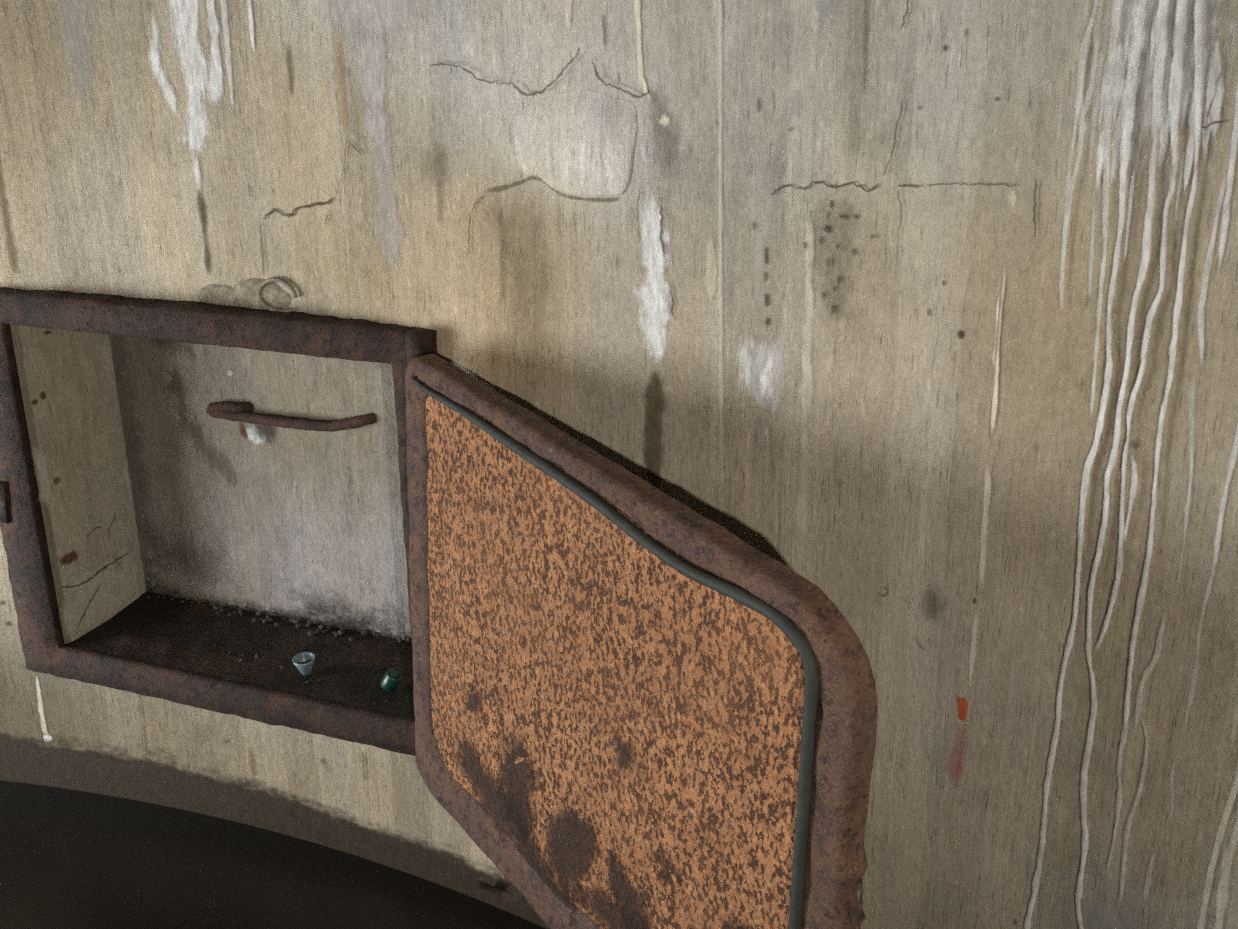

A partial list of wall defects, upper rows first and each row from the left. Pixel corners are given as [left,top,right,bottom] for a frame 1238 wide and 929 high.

leakage [150,0,232,270]
crack [264,141,361,221]
crack [468,196,484,253]
crack [430,48,649,98]
crack [771,102,1038,236]
leakage [1198,92,1238,356]
leakage [636,195,671,484]
rust [62,551,77,564]
leakage [1215,426,1238,556]
leakage [0,680,550,929]
leakage [1198,771,1238,929]